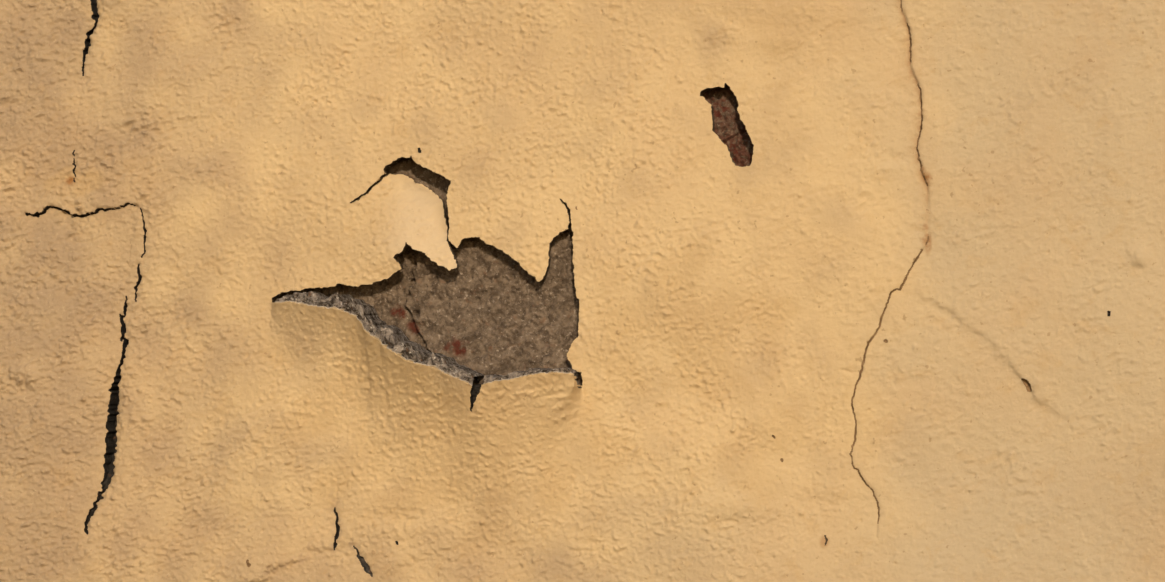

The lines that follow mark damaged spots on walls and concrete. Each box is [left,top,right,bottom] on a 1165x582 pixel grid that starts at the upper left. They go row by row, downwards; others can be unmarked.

crack [20,0,149,536]
spalling [272,145,583,388]
hole [700,83,754,167]
crack [837,0,1075,542]